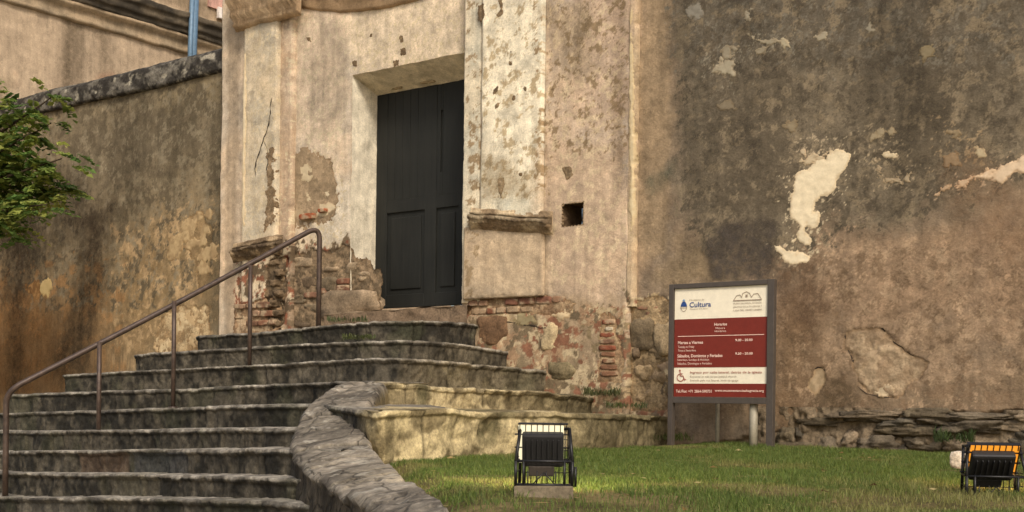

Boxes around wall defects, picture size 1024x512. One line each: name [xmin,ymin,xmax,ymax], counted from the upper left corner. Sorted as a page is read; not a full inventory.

crack [254,98,279,232]
peeling [295,147,340,231]
peeling [774,148,851,265]
peeling [934,129,1024,197]
water stain [5,184,112,369]
flaking render [233,244,385,333]
water stain [707,222,775,279]
flaking render [467,295,576,380]
flaking render [597,312,625,383]